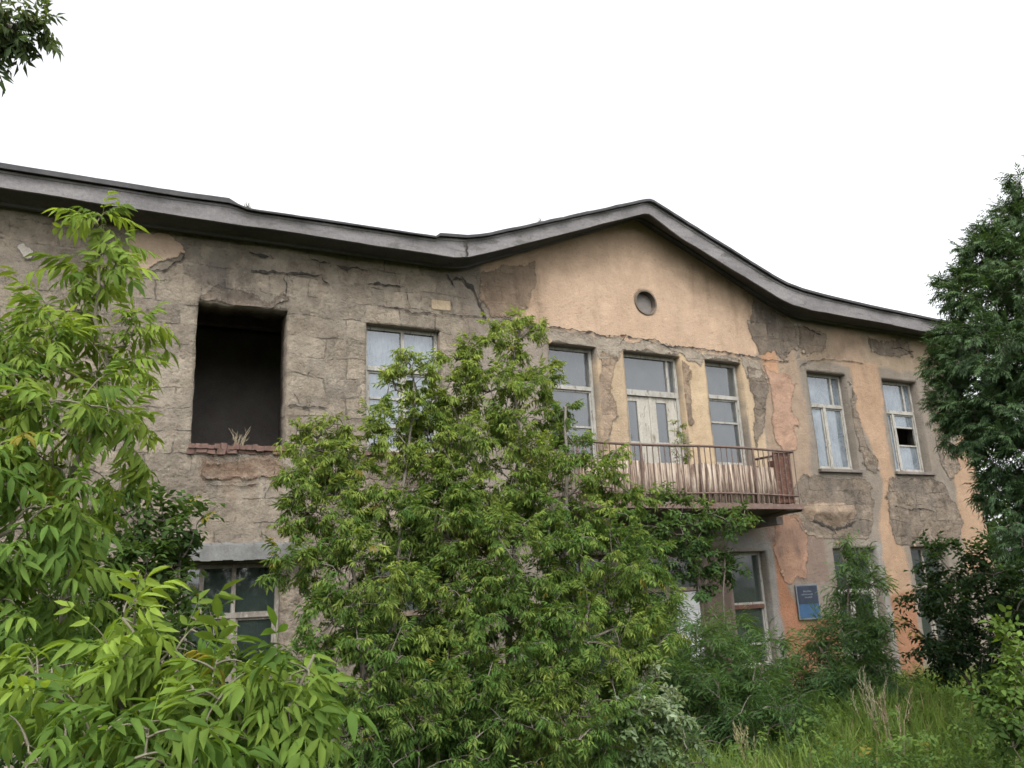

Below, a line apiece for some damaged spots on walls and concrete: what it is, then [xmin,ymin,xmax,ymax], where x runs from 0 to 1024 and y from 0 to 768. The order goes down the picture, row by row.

flaking render [17,243,33,259]
flaking render [128,233,185,269]
spalling [199,284,290,308]
crack [249,240,486,319]
spalling [431,299,451,311]
flaking render [479,261,537,338]
spalling [868,337,914,358]
spalling [539,301,827,454]
spalling [201,455,285,480]
spalling [367,456,437,491]
spalling [773,381,964,584]